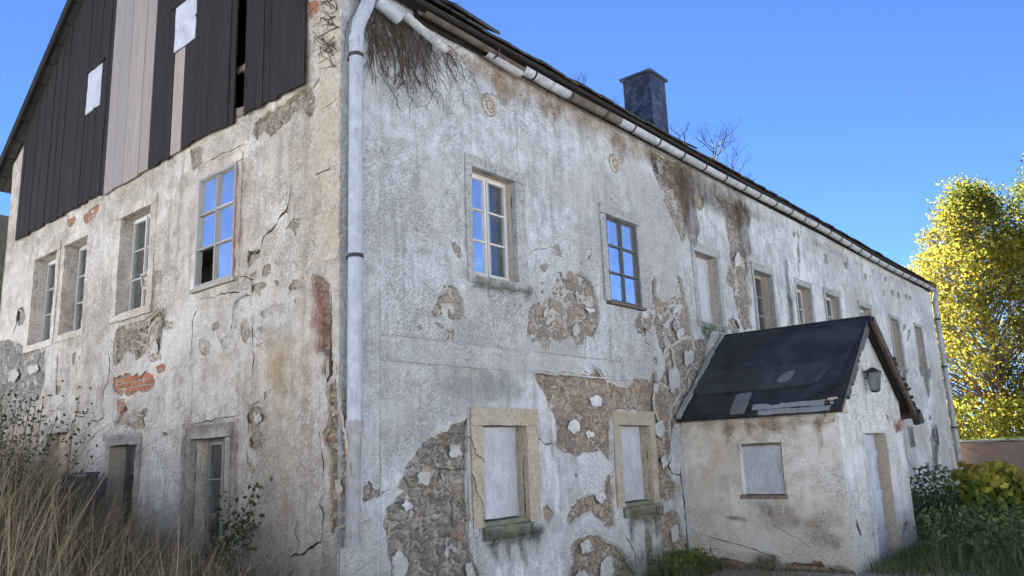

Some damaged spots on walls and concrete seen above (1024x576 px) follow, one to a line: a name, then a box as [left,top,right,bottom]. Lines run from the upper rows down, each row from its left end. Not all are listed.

flaking render [254,87,315,140]
flaking render [0,340,46,434]
flaking render [114,309,174,430]
crack [190,186,292,448]
flaking render [199,250,355,534]
flaking render [431,285,463,341]
flaking render [526,249,600,350]
flaking render [534,276,859,576]
damp [651,157,750,254]
flaking render [649,149,752,333]
crack [290,432,325,564]
flaking render [362,419,478,576]